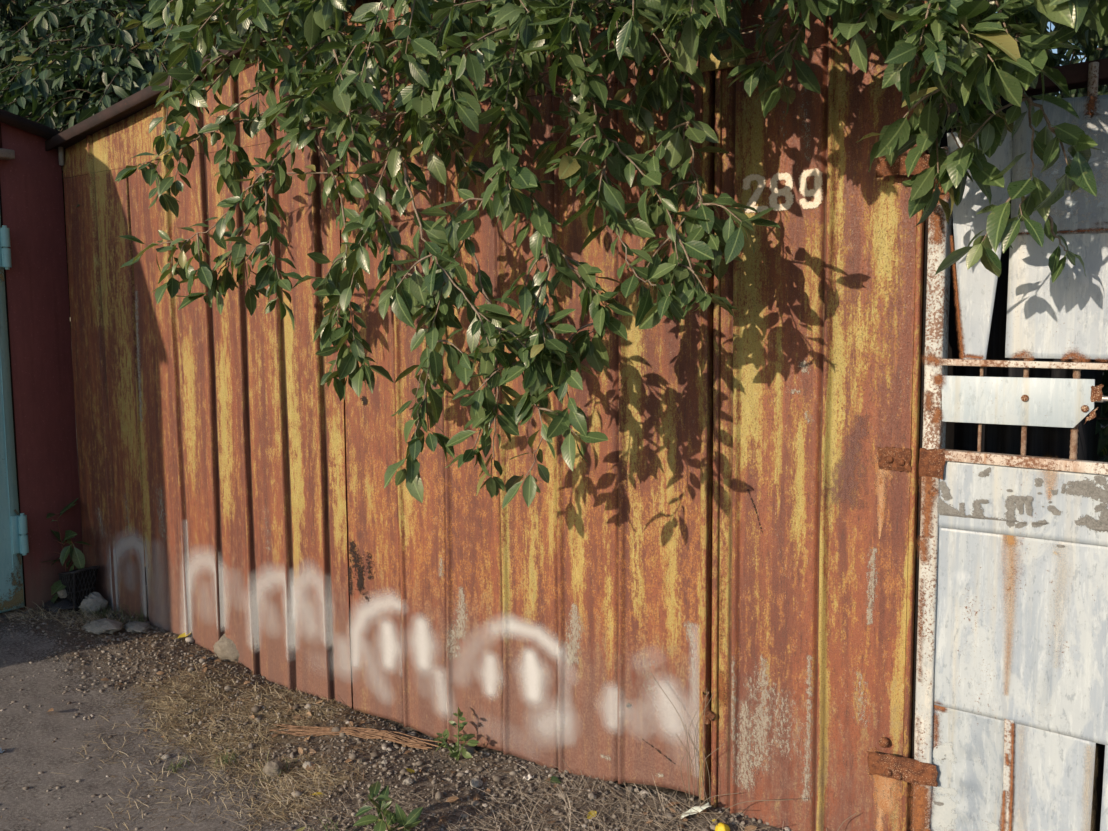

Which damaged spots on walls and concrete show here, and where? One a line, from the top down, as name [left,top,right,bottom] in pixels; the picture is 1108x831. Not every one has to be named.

corrosion [1063,350,1108,363]
corrosion [923,352,944,425]
corrosion [870,449,939,563]
peeling [938,474,1108,533]
peeling [730,655,814,801]
corrosion [932,702,947,748]
corrosion [870,775,932,831]